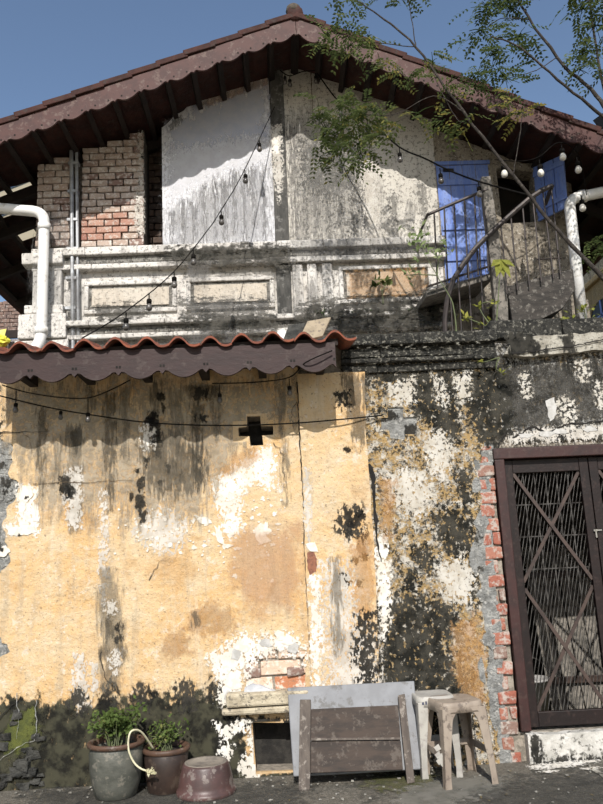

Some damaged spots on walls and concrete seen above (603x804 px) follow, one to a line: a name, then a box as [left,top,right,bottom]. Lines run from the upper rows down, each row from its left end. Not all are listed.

leakage [162,123,284,204]
leakage [92,300,150,322]
leakage [175,295,278,336]
spalling [518,371,533,399]
spalling [574,358,603,410]
peeling [0,438,42,572]
peeling [118,444,288,579]
leakage [292,290,603,697]
leakage [0,374,297,791]
spalling [469,394,603,763]
peeling [204,629,310,708]
peeling [212,718,260,778]